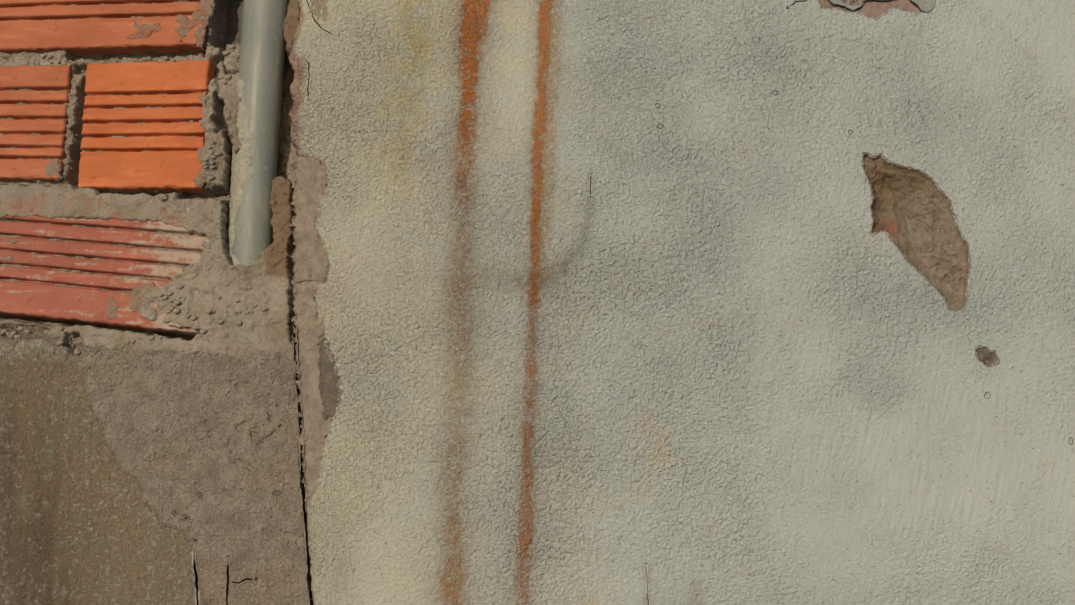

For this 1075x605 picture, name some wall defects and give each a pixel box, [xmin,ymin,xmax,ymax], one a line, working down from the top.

rust [457,0,490,186]
flaking render [818,0,935,20]
rust [519,0,552,603]
spalling [861,152,971,312]
spalling [975,345,1000,367]
leakage [0,348,205,605]
crack [292,324,314,605]
crack [190,541,256,605]